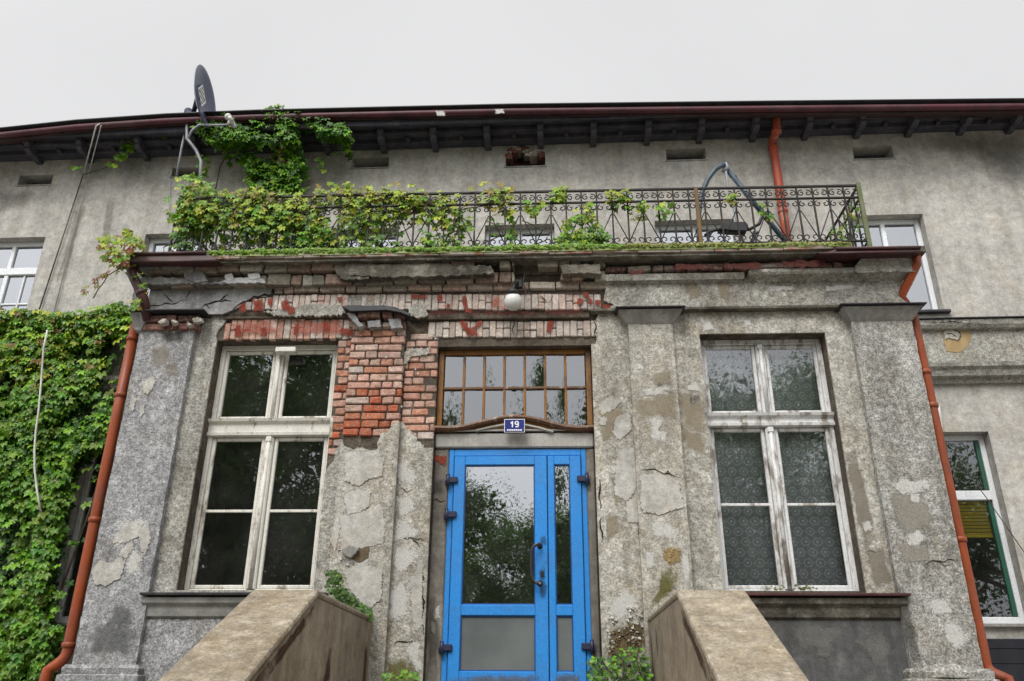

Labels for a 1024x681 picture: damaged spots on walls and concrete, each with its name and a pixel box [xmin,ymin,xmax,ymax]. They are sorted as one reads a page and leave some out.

flaking render [505,145,545,165]
crack [150,289,273,308]
peeling [942,330,971,353]
peeling [91,517,151,586]
flaking render [223,282,611,673]
peeling [598,397,690,585]
peeling [891,477,932,562]
peeling [605,588,643,660]